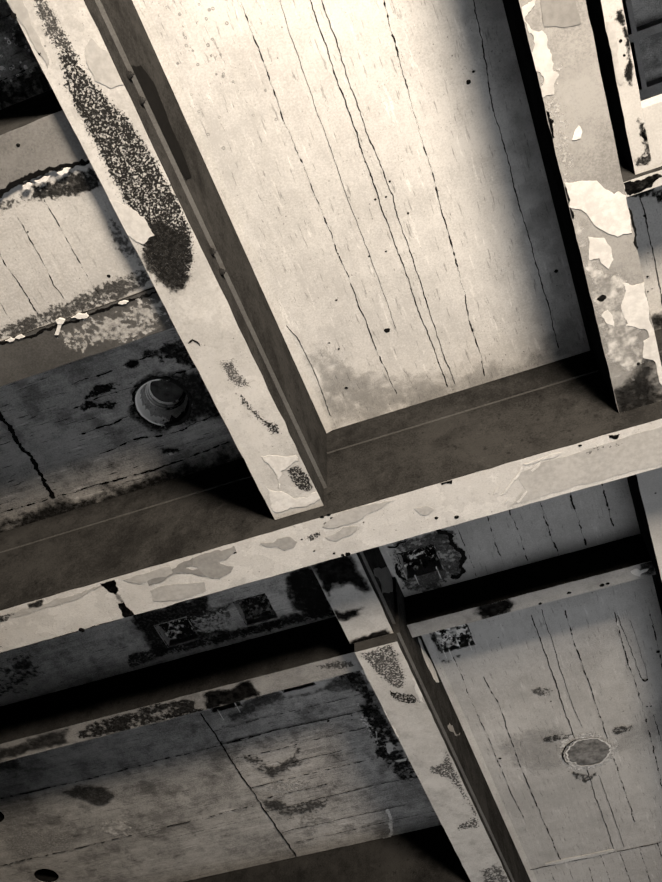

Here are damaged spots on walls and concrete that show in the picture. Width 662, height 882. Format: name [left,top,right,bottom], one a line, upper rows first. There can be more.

peeling [522,0,581,97]
peeling [606,21,626,85]
damp [0,0,221,433]
crack [242,2,397,394]
crack [310,0,455,387]
crack [383,1,485,376]
peeling [565,174,662,269]
peeling [597,276,662,385]
damp [127,568,335,667]
damp [77,699,203,738]
damp [301,644,420,781]
crack [453,610,662,882]